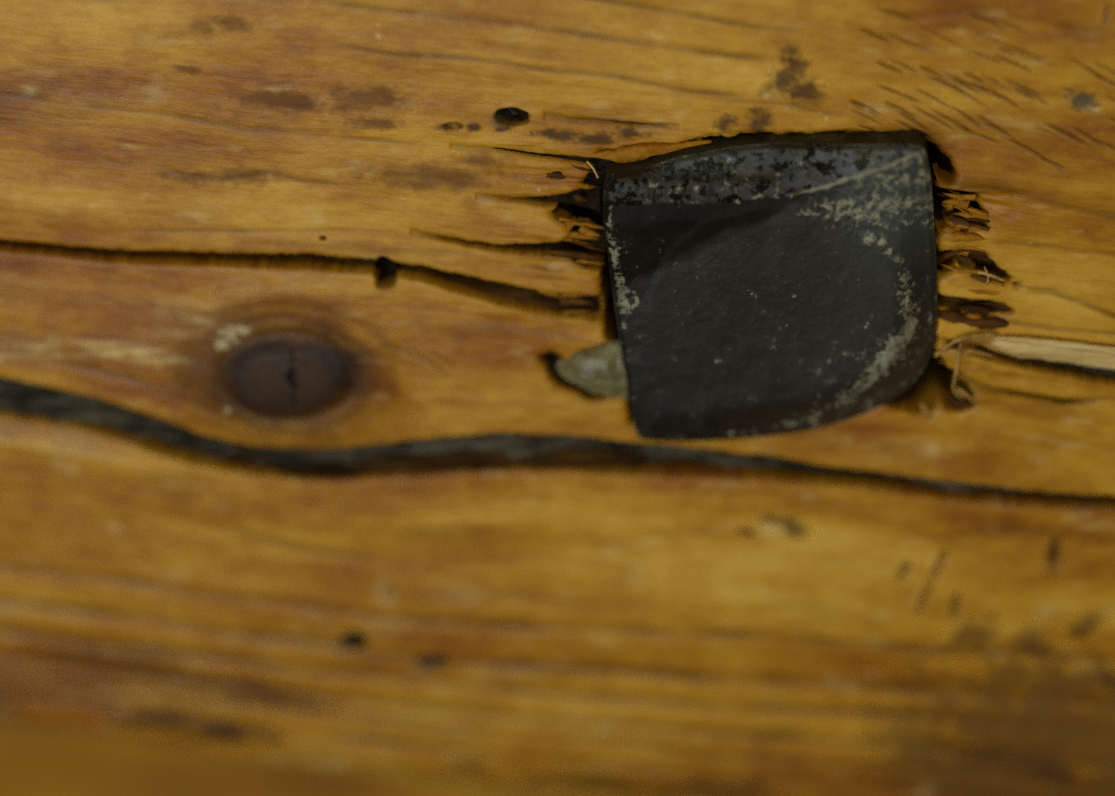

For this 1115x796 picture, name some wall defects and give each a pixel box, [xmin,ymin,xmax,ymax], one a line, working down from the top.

crack [491,147,609,250]
crack [423,265,607,313]
crack [284,348,297,408]
crack [1037,359,1115,376]
crack [0,377,1098,497]